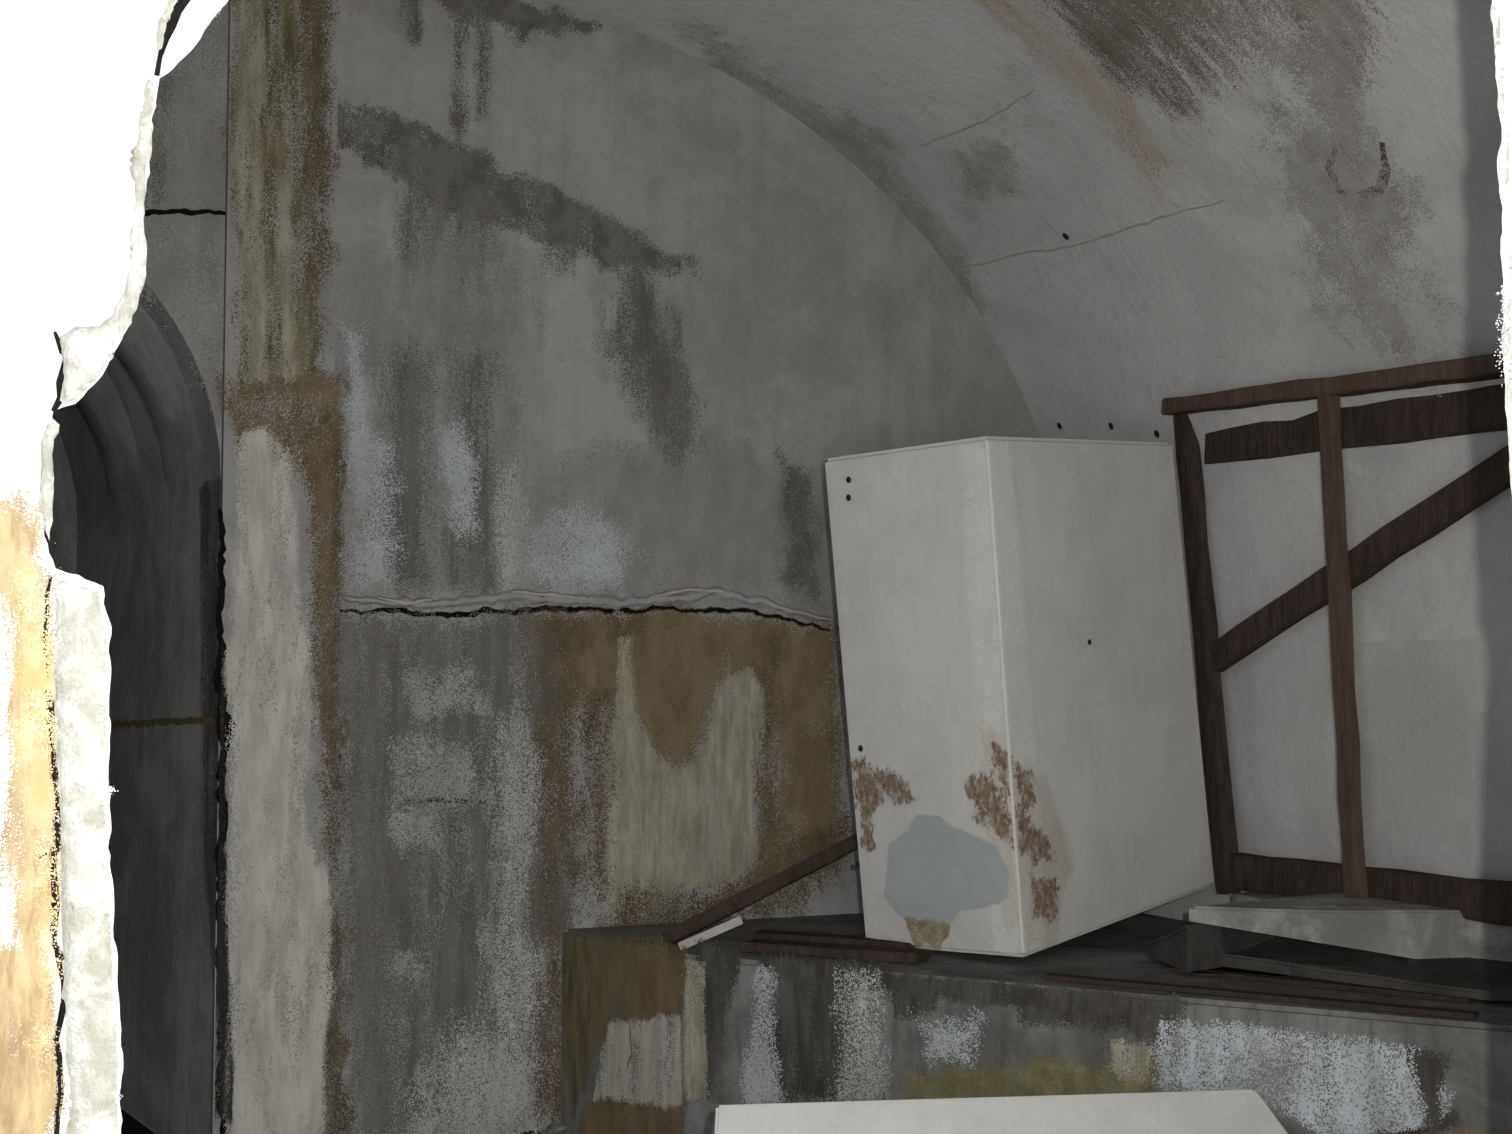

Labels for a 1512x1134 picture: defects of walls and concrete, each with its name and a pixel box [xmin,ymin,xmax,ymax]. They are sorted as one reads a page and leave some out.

spalling [39,79,157,541]
spalling [156,0,176,51]
leakage [139,0,229,424]
leakage [671,10,1032,321]
leakage [969,0,1479,369]
spalling [1501,209,1512,491]
spalling [48,580,123,1134]
rust [212,0,358,1134]
spalling [380,656,497,861]
leakage [197,0,857,1134]
flaking render [340,586,832,632]
leakage [739,950,1512,1134]